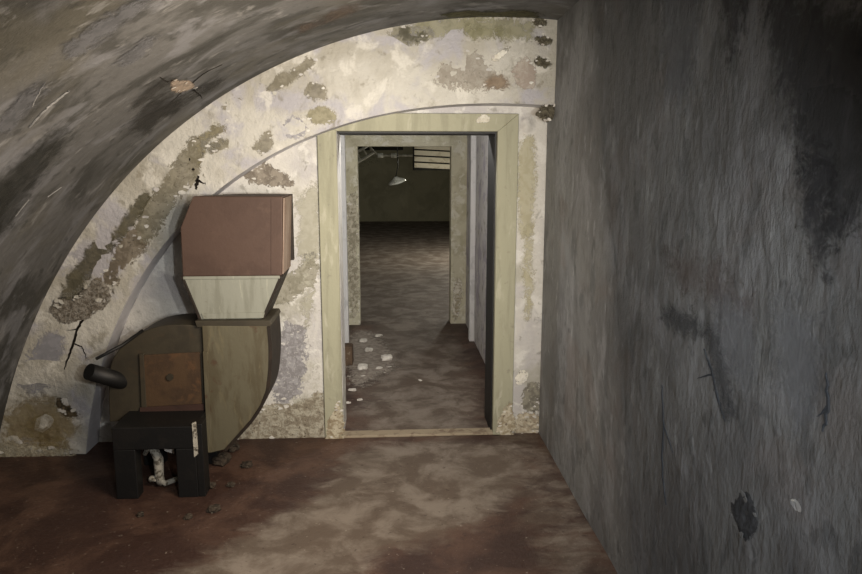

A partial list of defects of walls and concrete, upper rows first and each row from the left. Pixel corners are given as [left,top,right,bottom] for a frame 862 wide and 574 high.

peeling [387,25,428,46]
spalling [532,18,553,46]
flaking render [160,65,221,102]
peeling [434,47,552,93]
peeling [48,98,241,324]
crack [64,320,86,370]
peeling [238,318,363,440]
peeling [496,370,540,435]